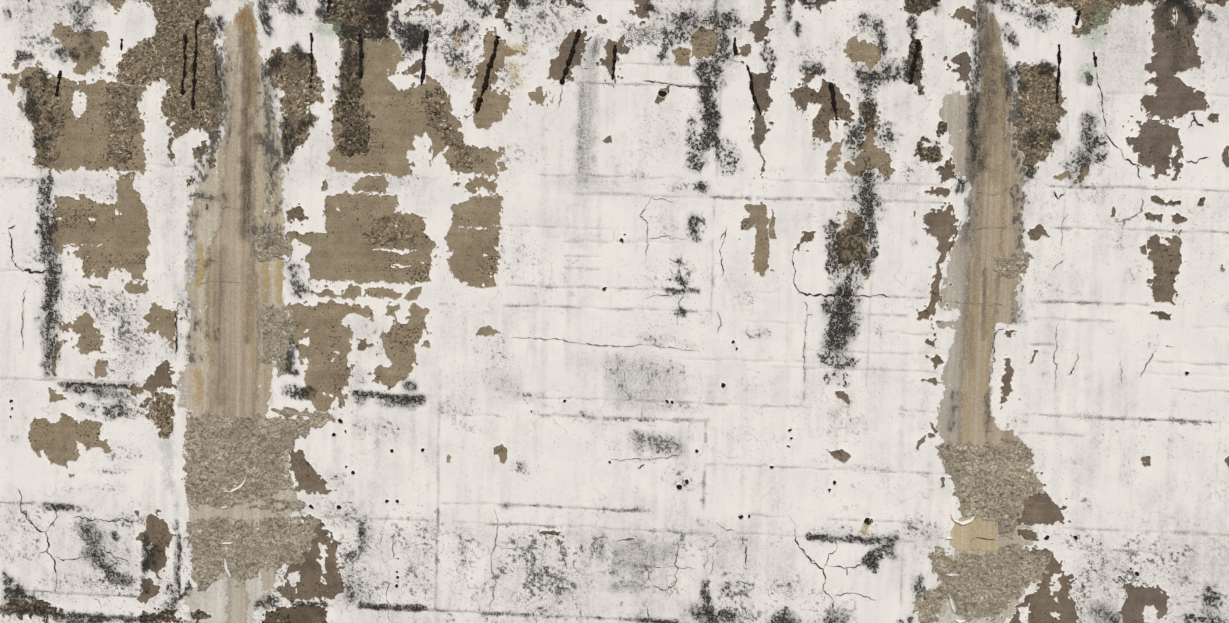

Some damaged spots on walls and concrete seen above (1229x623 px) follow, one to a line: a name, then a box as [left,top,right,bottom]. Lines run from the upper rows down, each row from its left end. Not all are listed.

damp [52,0,100,62]
peeling [654,84,671,105]
damp [800,62,826,76]
damp [16,50,128,419]
damp [818,13,914,388]
peeling [0,0,663,623]
peeling [671,0,1229,623]
crack [18,489,136,593]
crack [790,517,872,619]
damp [1184,586,1225,623]